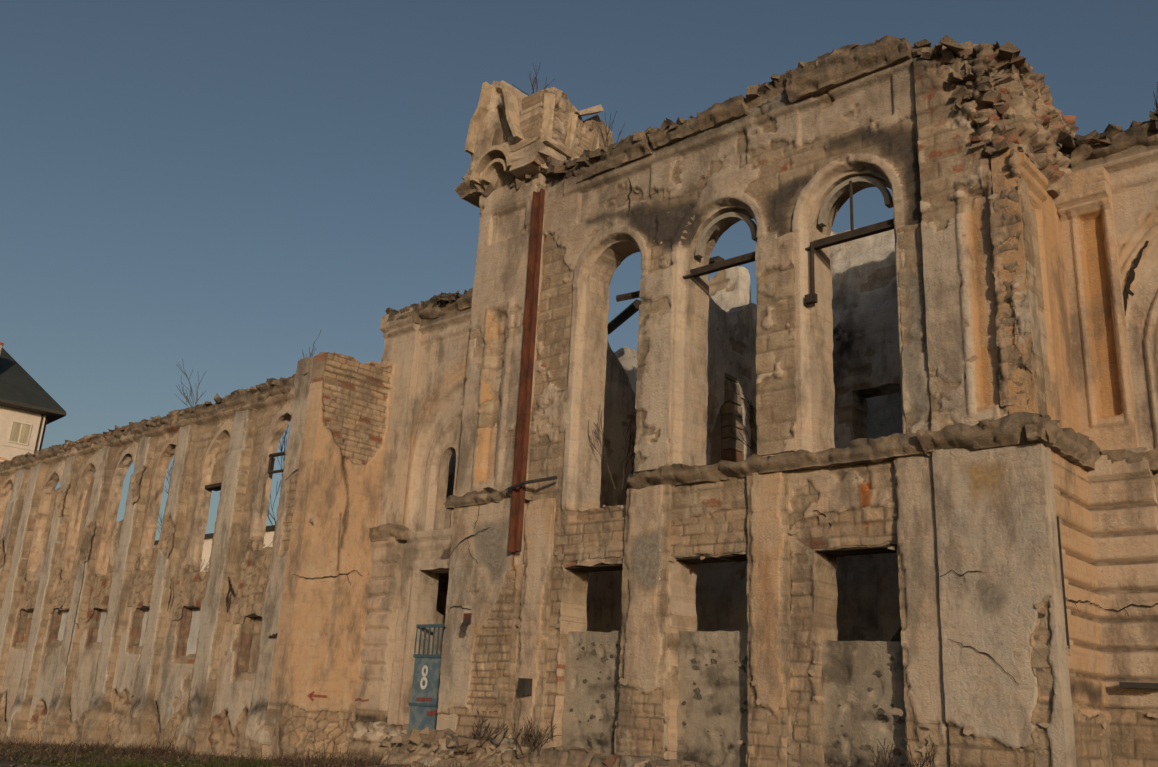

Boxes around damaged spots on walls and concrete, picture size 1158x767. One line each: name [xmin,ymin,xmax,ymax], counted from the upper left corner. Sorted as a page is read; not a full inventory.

damp [768,176,810,234]
damp [830,128,922,225]
spalling [911,35,1034,407]
crack [1123,241,1149,316]
spalling [323,353,393,465]
corrosion [860,483,871,507]
spalling [668,504,748,563]
crack [293,570,362,586]
spalling [379,568,542,767]
spalling [734,505,897,767]
crack [950,639,1021,685]
crack [1049,596,1158,616]